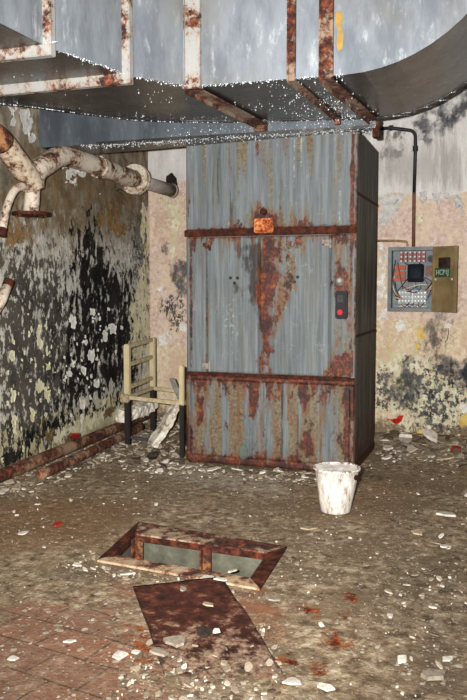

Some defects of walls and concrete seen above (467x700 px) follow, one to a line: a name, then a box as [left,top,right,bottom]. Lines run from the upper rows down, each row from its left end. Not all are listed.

leakage [414,87,467,144]
peeling [378,192,407,226]
leakage [0,167,150,467]
leakage [160,261,187,332]
leakage [374,312,467,435]